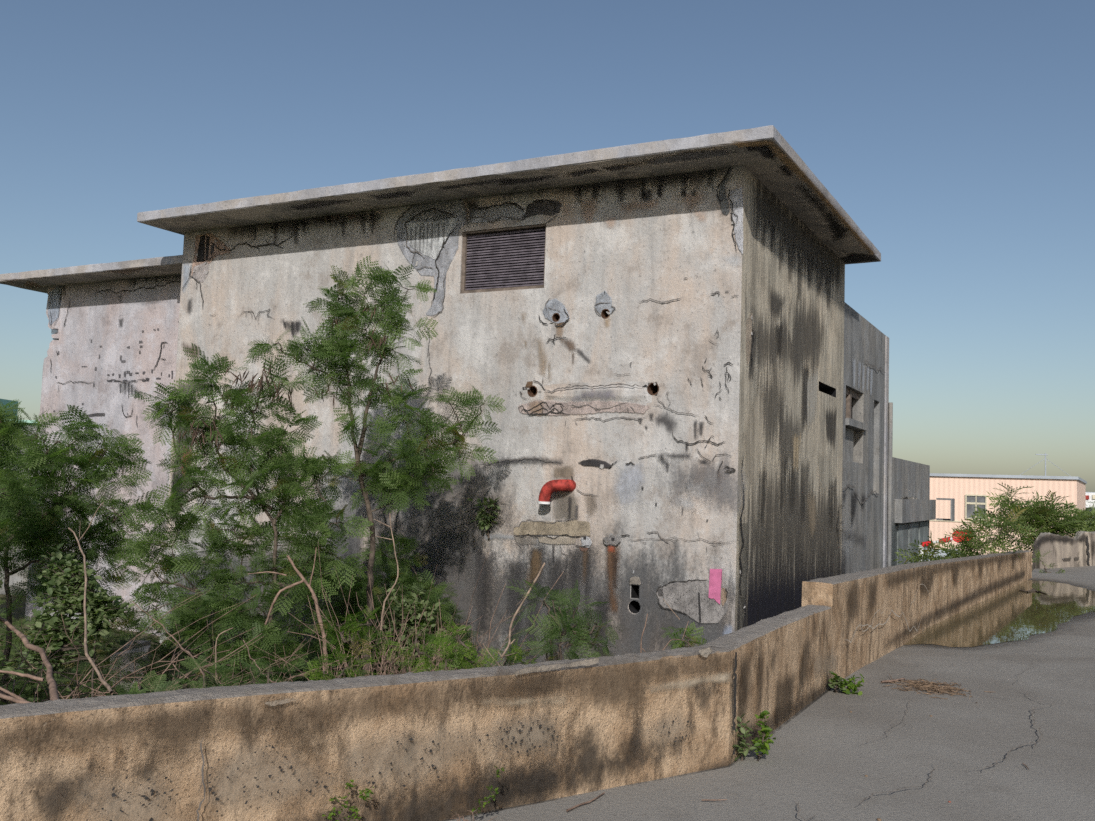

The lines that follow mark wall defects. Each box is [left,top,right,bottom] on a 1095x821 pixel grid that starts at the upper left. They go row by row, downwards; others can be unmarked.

crack [231,235,293,251]
leakage [374,192,411,200]
peeling [394,200,526,317]
leakage [442,141,876,287]
leakage [170,291,865,714]
crack [565,291,754,609]
leakage [738,645,832,749]